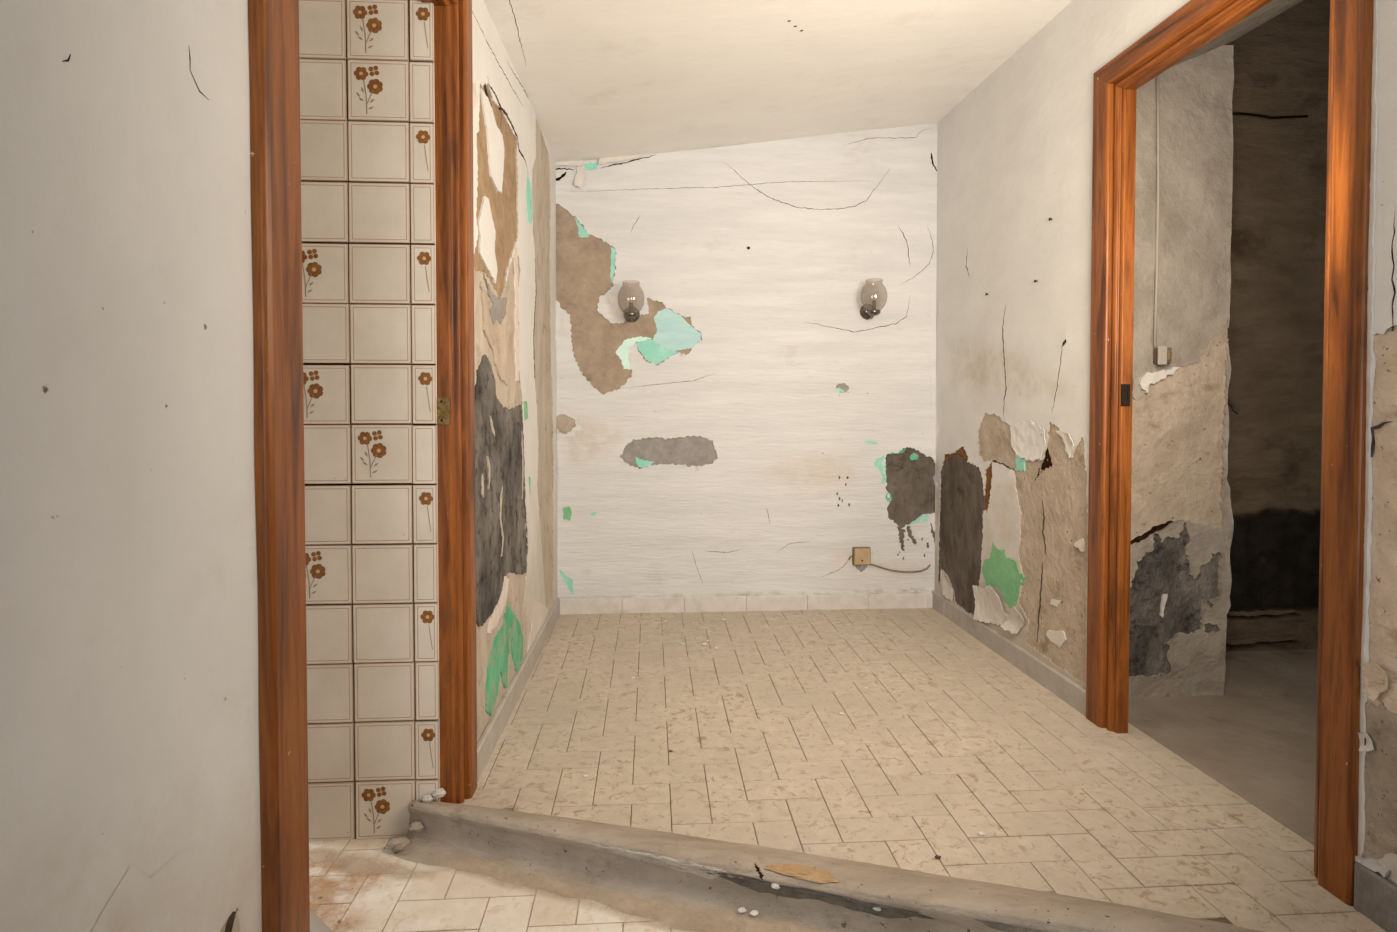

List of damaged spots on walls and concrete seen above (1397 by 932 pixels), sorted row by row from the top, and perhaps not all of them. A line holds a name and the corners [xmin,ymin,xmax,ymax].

crack [189,49,209,100]
crack [472,0,937,229]
flaking render [473,83,702,606]
flaking render [476,571,526,743]
flaking render [619,436,718,469]
flaking render [865,441,935,560]
peeling [941,571,953,602]
flaking render [972,413,1088,683]
flaking render [1131,325,1240,540]
peeling [1357,732,1374,751]
flaking render [1367,325,1397,714]
peeling [220,911,240,932]